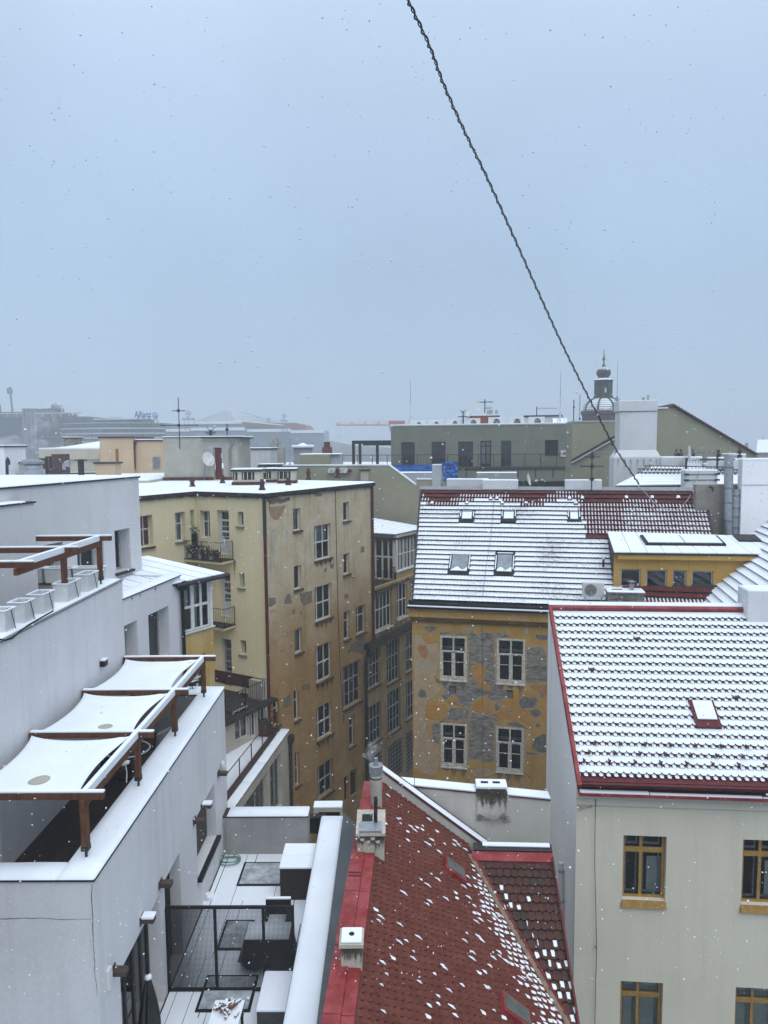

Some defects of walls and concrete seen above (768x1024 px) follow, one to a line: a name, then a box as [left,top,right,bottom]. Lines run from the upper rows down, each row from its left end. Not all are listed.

peeling [369,620,548,789]
leakage [476,773,521,807]